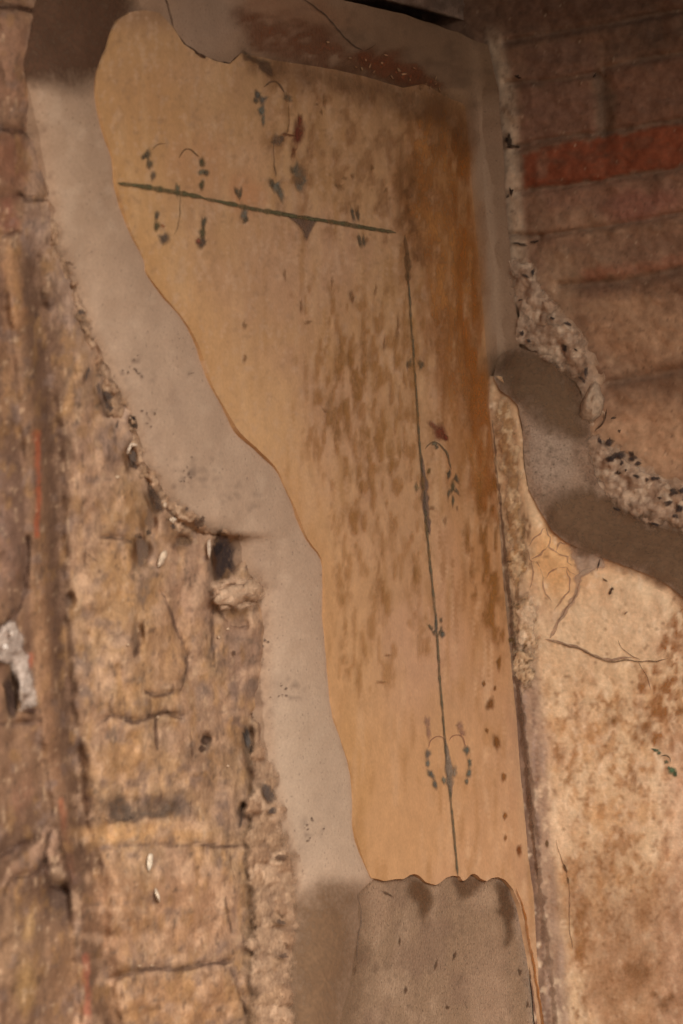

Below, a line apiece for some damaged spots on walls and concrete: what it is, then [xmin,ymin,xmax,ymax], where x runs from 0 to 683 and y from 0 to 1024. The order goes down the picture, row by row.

spalling [50,220,243,580]
peeling [495,400,529,585]
spalling [509,259,683,532]
spalling [4,679,36,716]
spalling [104,797,180,822]
spalling [239,713,299,1024]
peeling [513,594,540,685]
crack [492,420,665,1024]